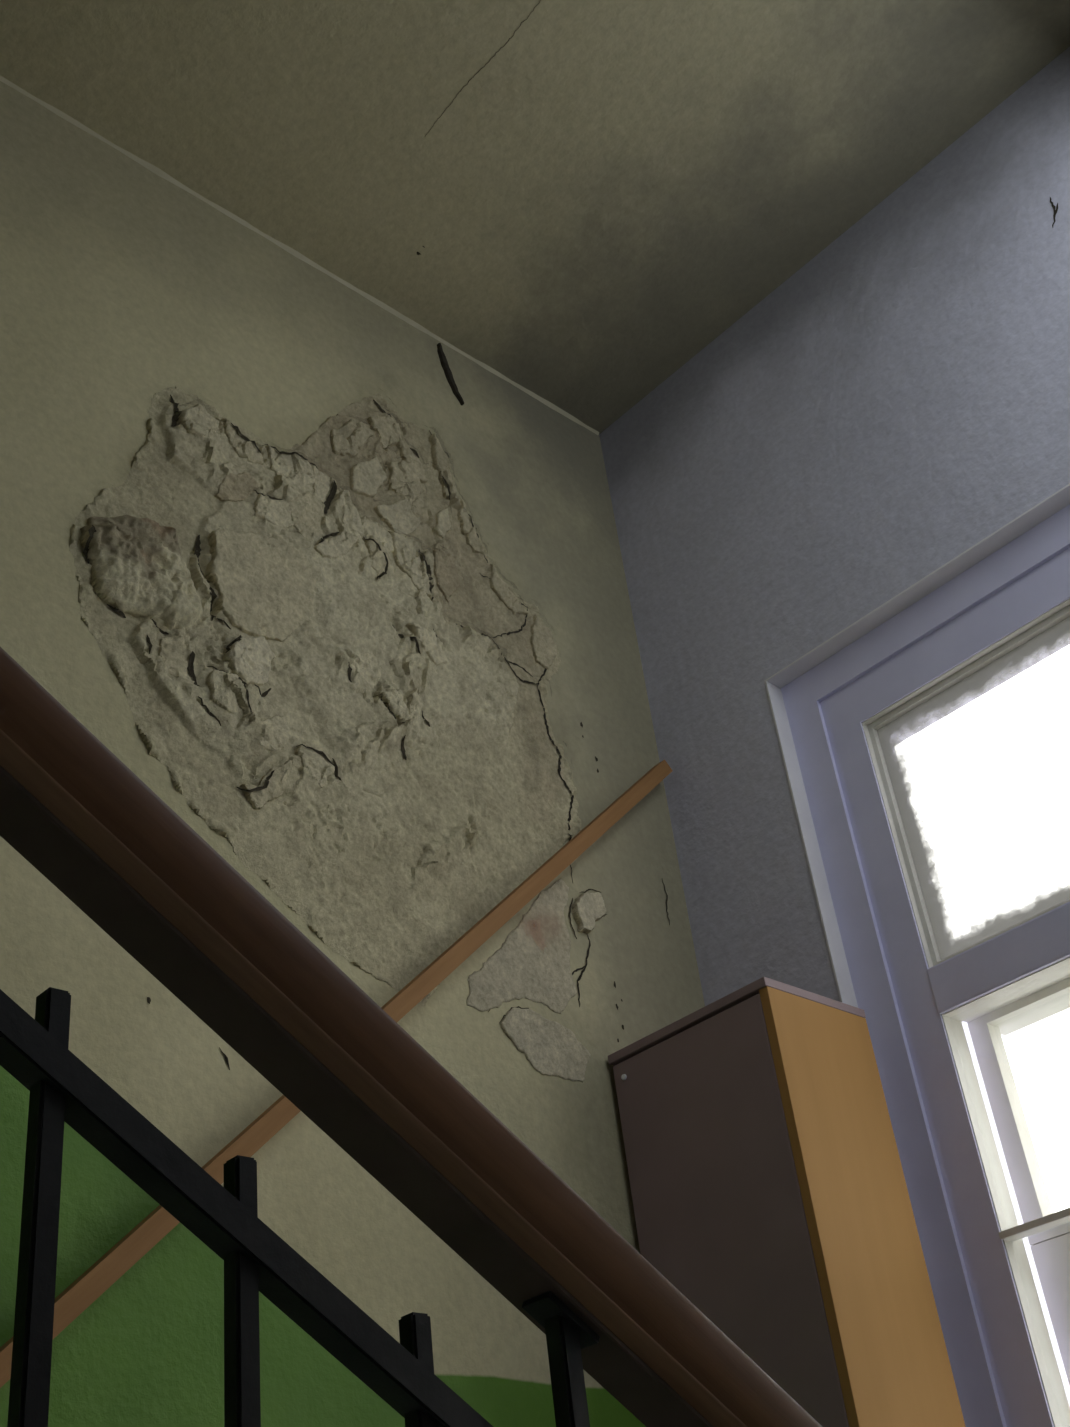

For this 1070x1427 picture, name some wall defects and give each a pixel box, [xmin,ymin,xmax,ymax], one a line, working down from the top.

spalling [437,343,464,405]
flaking render [69,386,582,991]
spalling [569,889,607,939]
peeling [499,1006,591,1083]